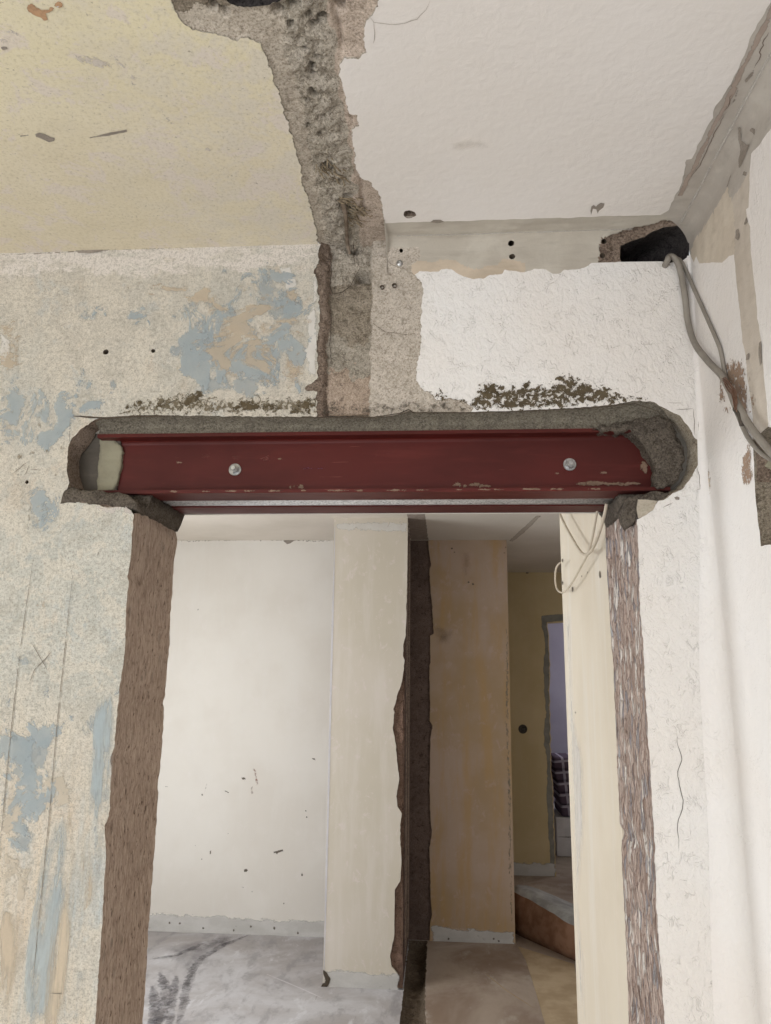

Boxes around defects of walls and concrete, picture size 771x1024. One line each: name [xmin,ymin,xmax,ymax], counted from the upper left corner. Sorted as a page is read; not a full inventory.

spalling [150,0,473,419]
peeling [727,127,755,186]
peeling [0,380,105,451]
spalling [753,427,771,546]
peeling [0,716,72,1023]